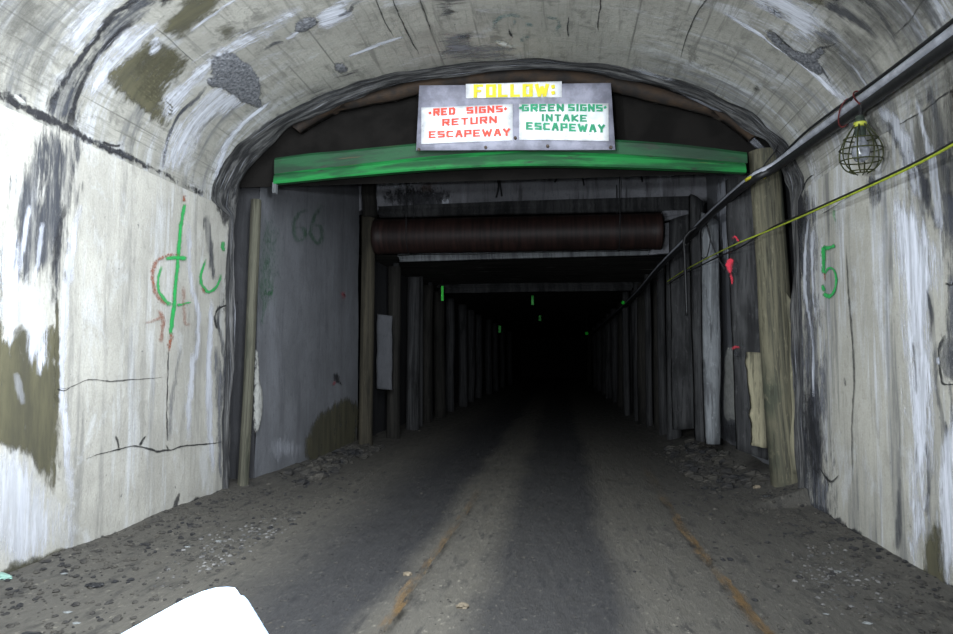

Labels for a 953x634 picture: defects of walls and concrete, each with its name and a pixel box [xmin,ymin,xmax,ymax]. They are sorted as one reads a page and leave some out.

leakage [50,0,293,178]
spalling [207,51,263,108]
leakage [732,16,840,97]
leakage [755,0,872,44]
leakage [0,209,76,573]
crack [58,355,216,457]
leakage [883,110,953,583]